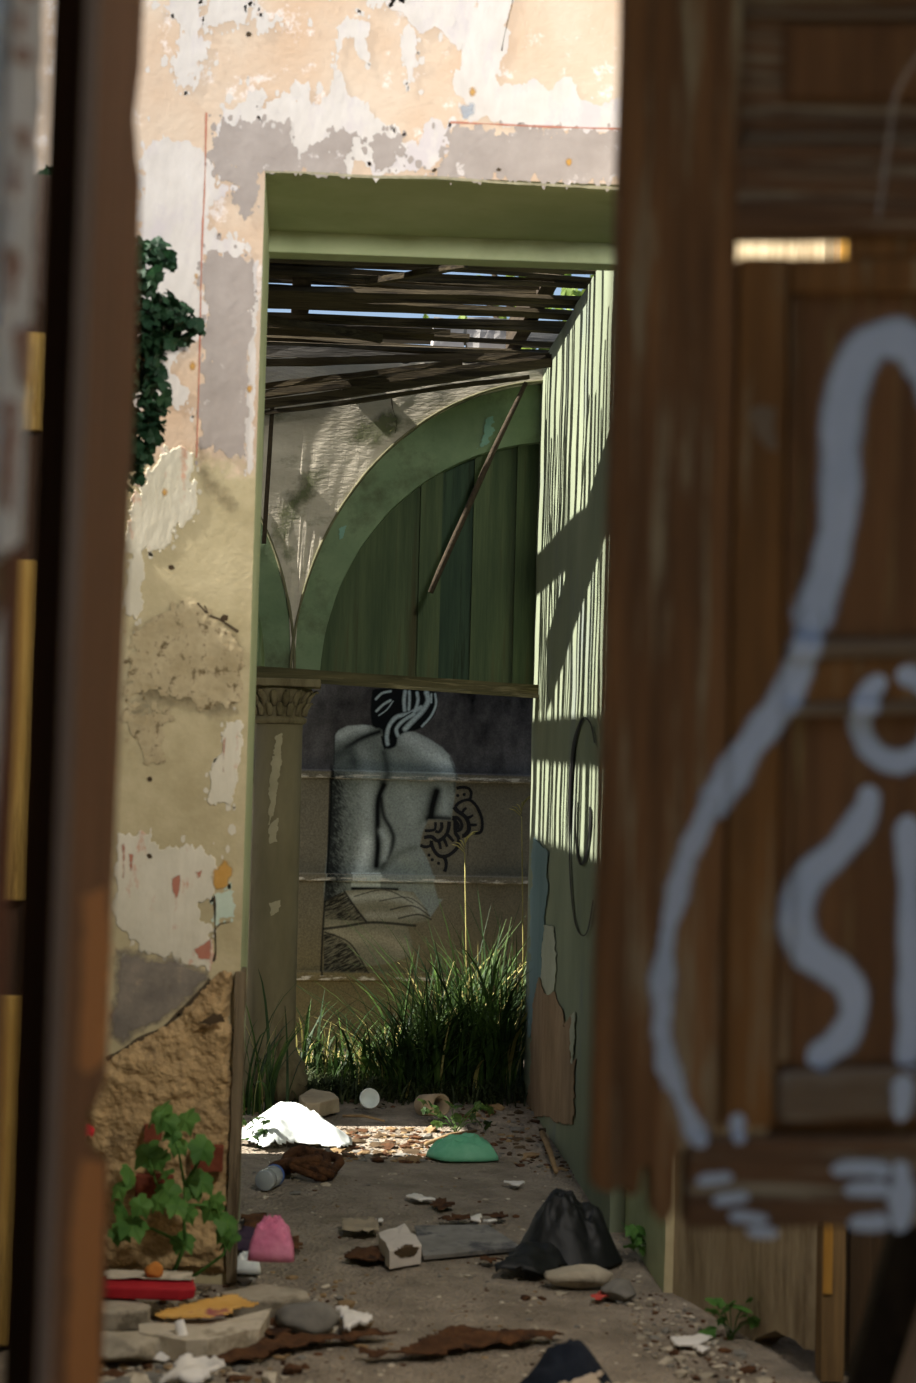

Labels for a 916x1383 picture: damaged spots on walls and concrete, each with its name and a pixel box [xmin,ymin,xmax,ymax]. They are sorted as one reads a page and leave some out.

spalling [90,0,617,1275]